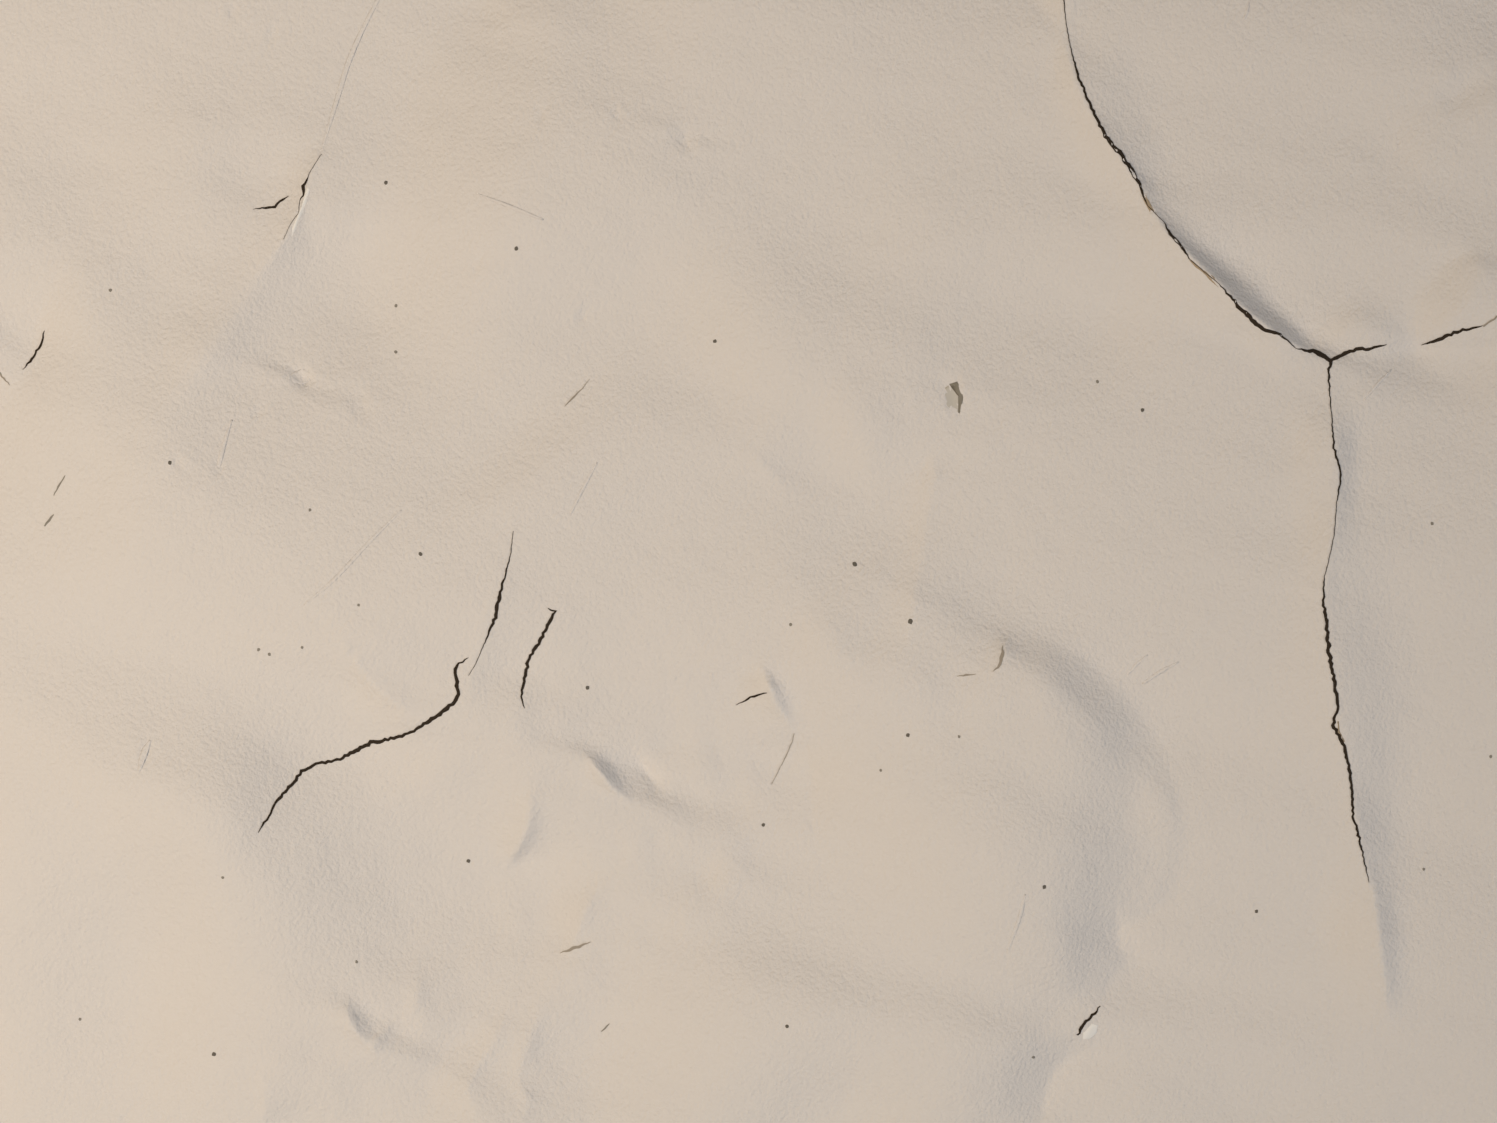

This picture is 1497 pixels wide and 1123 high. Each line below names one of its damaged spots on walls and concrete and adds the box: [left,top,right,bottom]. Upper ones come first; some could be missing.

crack [1063,0,1497,881]
crack [258,534,513,833]
crack [520,608,557,708]